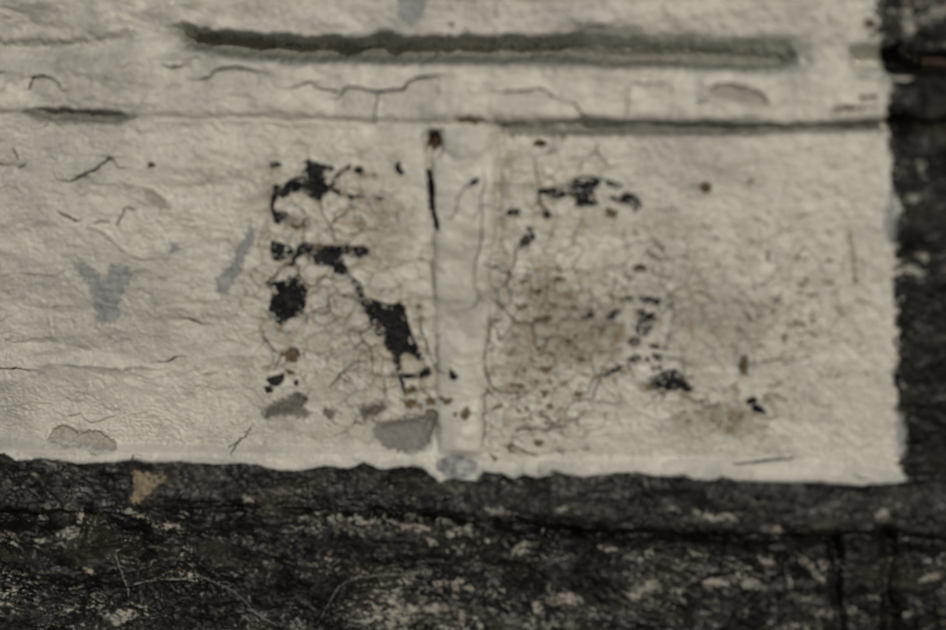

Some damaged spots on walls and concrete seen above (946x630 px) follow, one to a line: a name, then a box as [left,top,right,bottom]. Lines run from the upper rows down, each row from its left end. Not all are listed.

crack [291,75,438,122]
crack [697,83,770,119]
crack [287,201,387,244]
crack [261,265,406,401]
crack [411,261,447,375]
crack [427,170,557,444]
crack [515,413,566,456]